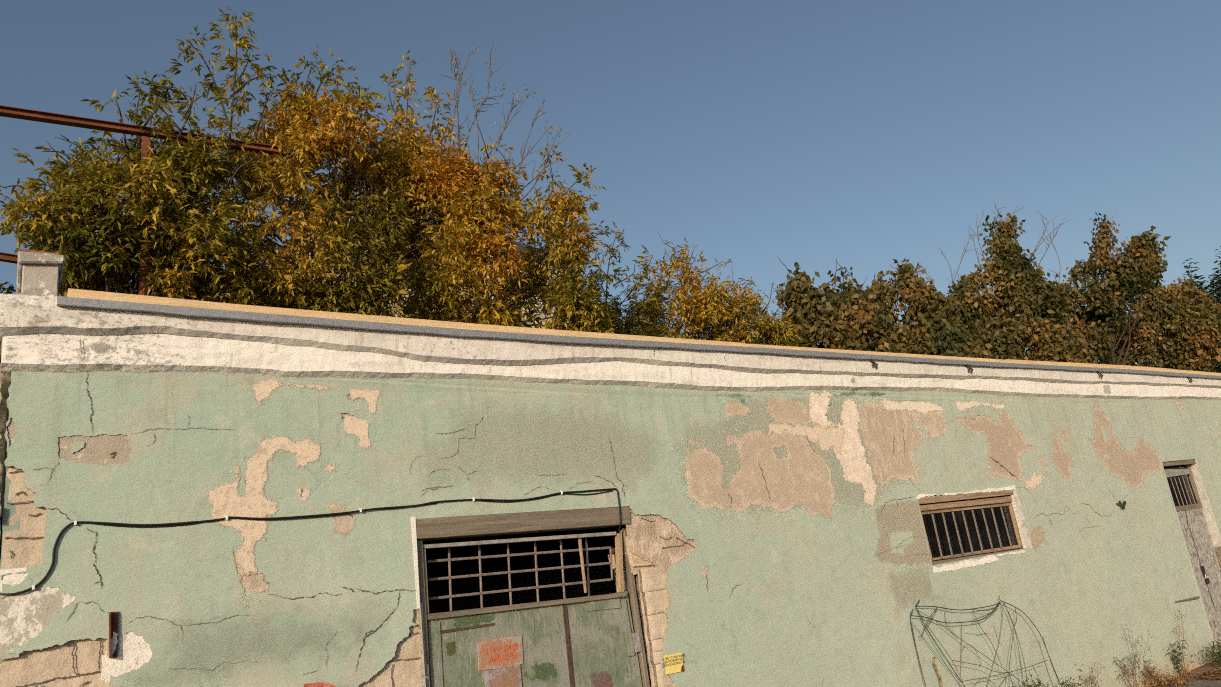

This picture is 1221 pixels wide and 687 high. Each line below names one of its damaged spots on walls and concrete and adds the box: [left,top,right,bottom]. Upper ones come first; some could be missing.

flaking render [58,434,132,466]
peeling [207,435,339,607]
peeling [341,388,380,448]
crack [409,417,483,495]
flaking render [683,390,1074,565]
flaking render [1088,385,1163,489]
spalling [0,467,152,687]
crack [271,587,417,675]
spalling [359,603,426,687]
spalling [608,506,695,687]